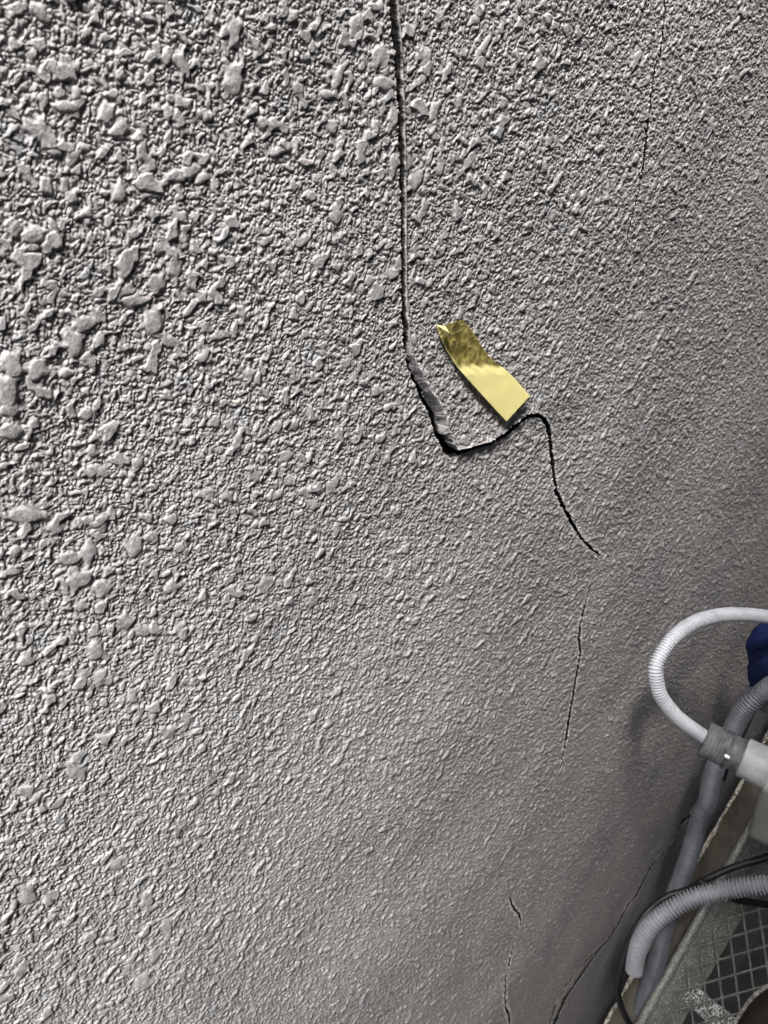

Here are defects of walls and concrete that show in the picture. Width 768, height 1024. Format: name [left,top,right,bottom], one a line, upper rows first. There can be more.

crack [388,0,603,770]
crack [547,808,693,1024]